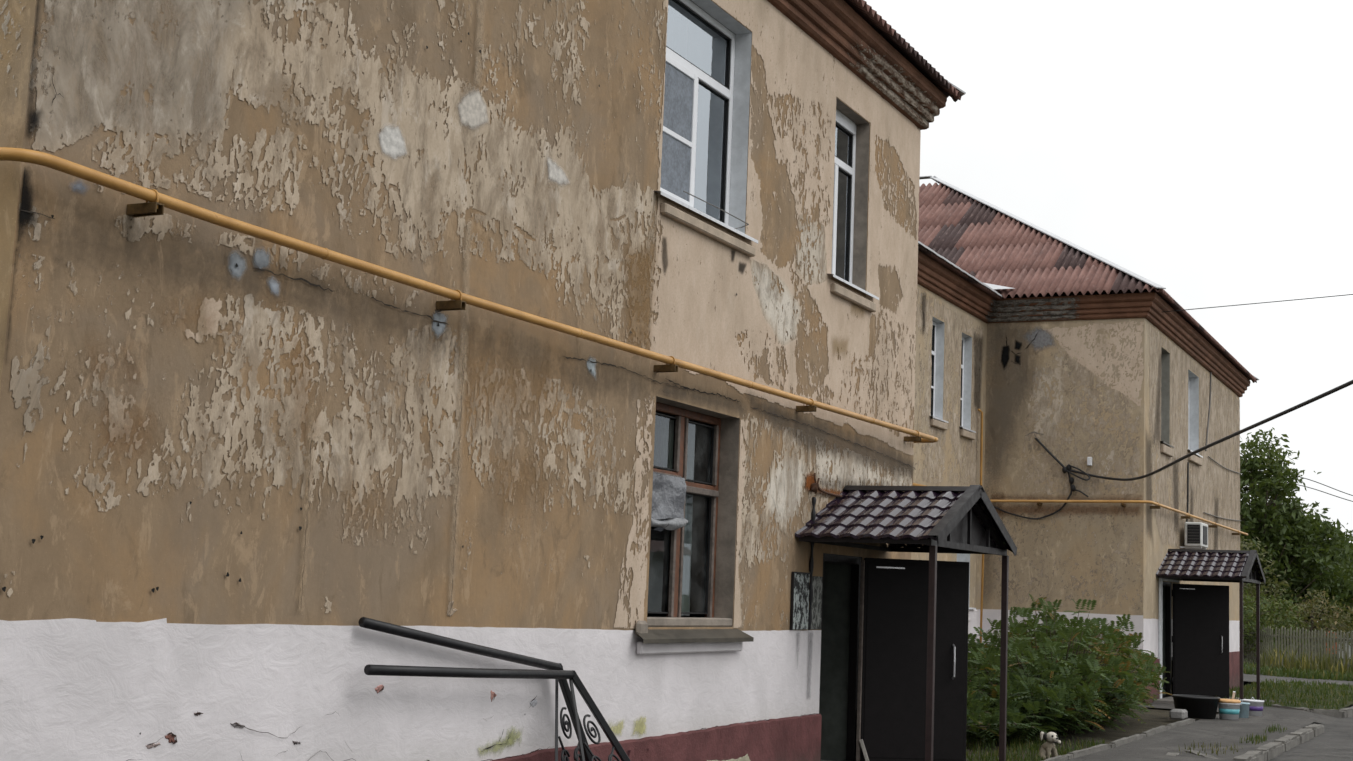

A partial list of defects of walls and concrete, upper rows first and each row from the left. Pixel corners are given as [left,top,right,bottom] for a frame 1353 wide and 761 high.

crack [255,267,332,292]
peeling [0,0,983,629]
crack [563,356,915,469]
crack [234,711,356,761]
crack [481,716,548,761]